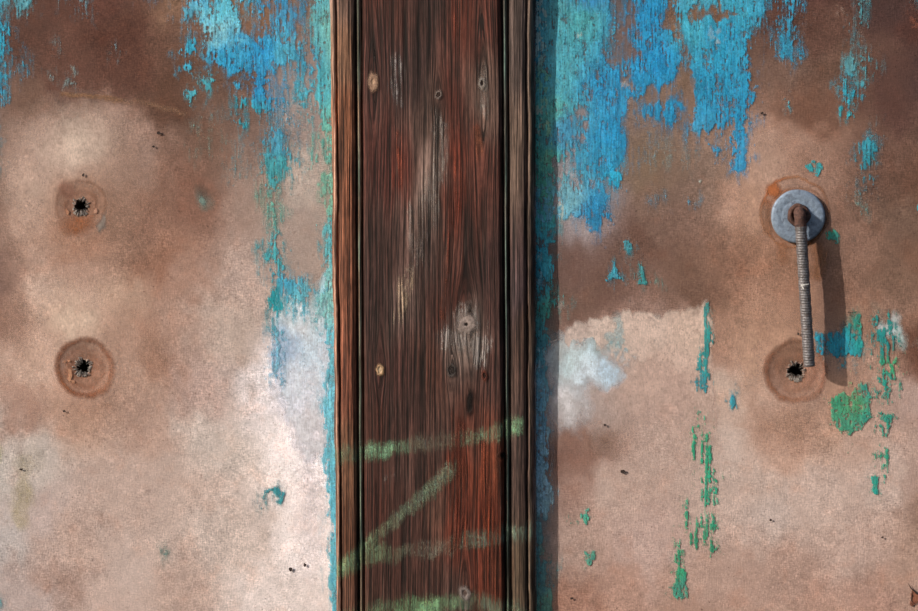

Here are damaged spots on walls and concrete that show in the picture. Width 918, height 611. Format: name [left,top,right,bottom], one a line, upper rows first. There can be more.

peeling [0,0,31,106]
peeling [839,51,877,119]
corrosion [760,175,830,248]
peeling [805,160,823,177]
peeling [855,135,878,185]
peeling [179,0,337,611]
peeling [534,0,805,611]
peeling [814,309,902,494]